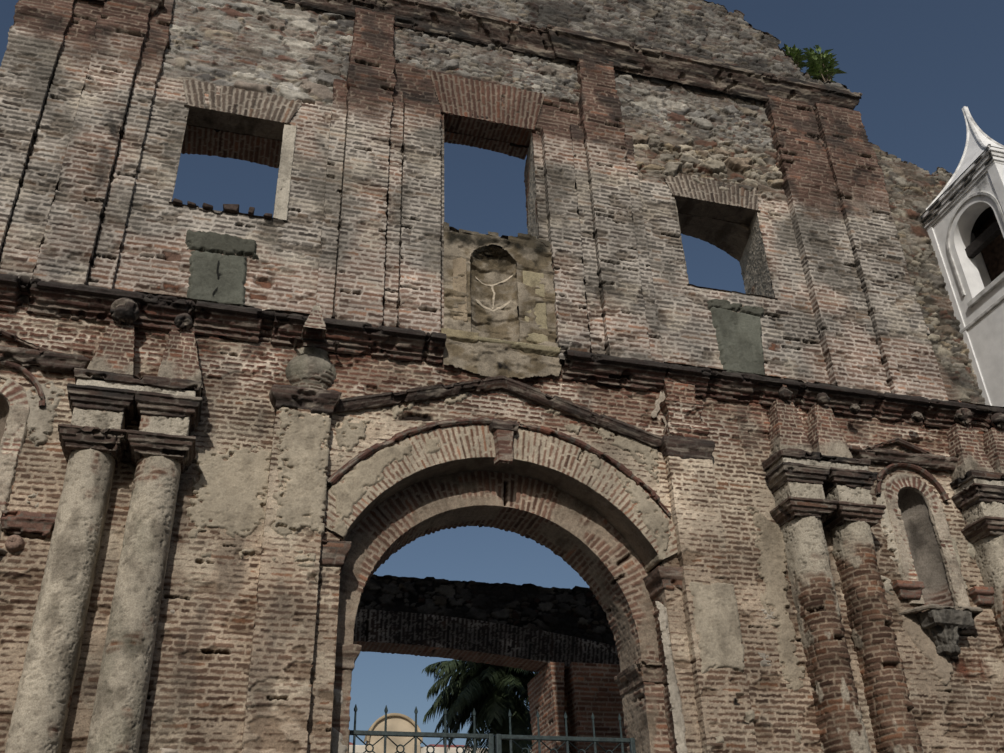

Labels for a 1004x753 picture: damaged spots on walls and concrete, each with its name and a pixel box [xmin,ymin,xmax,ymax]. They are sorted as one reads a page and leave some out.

peeling [746,505,805,694]